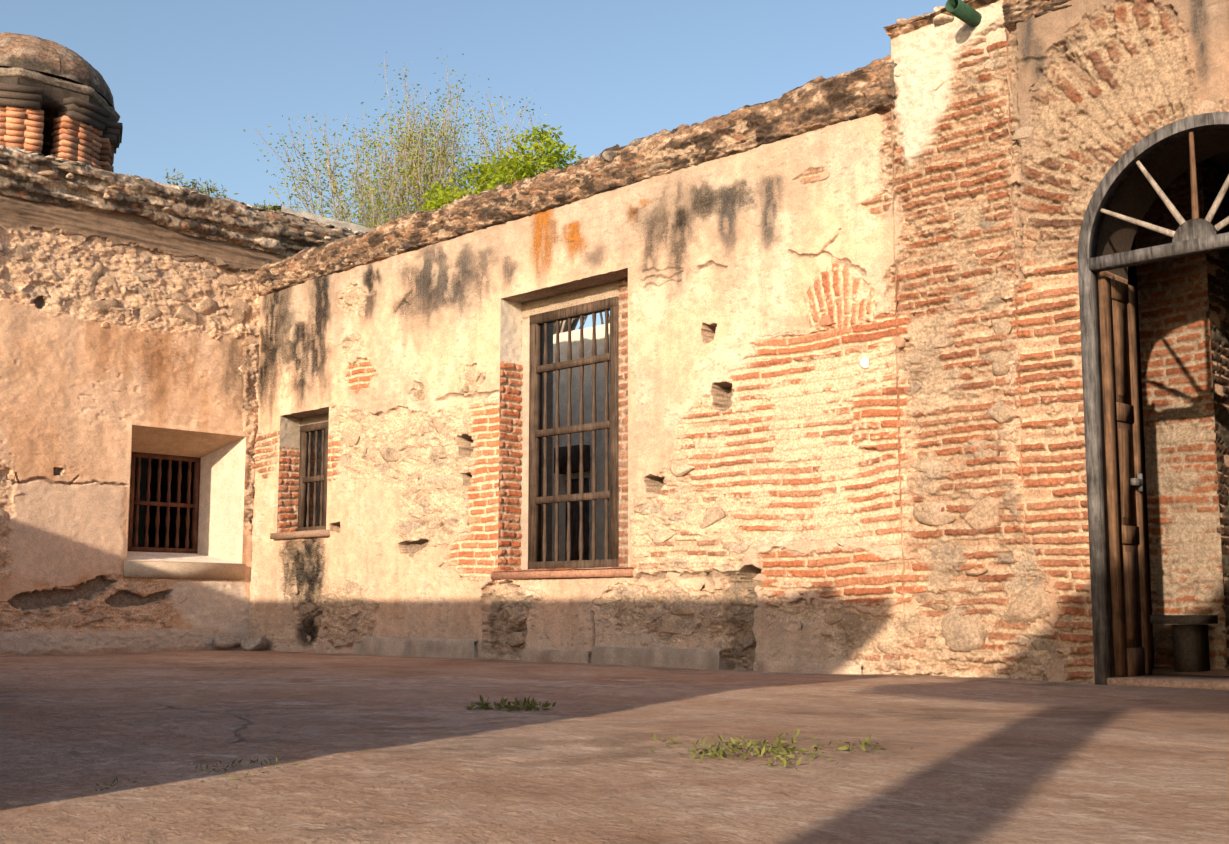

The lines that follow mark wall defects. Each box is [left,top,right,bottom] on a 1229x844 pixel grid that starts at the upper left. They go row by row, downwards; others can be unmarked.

spalling [0,226,280,531]
water stain [225,275,330,399]
water stain [364,266,379,313]
water stain [405,247,487,311]
water stain [646,179,778,271]
crack [787,228,867,278]
spalling [591,0,1229,683]
spalling [0,463,22,584]
crack [12,472,130,487]
spalling [325,331,547,660]
spalling [0,573,187,635]
spalling [278,521,340,648]